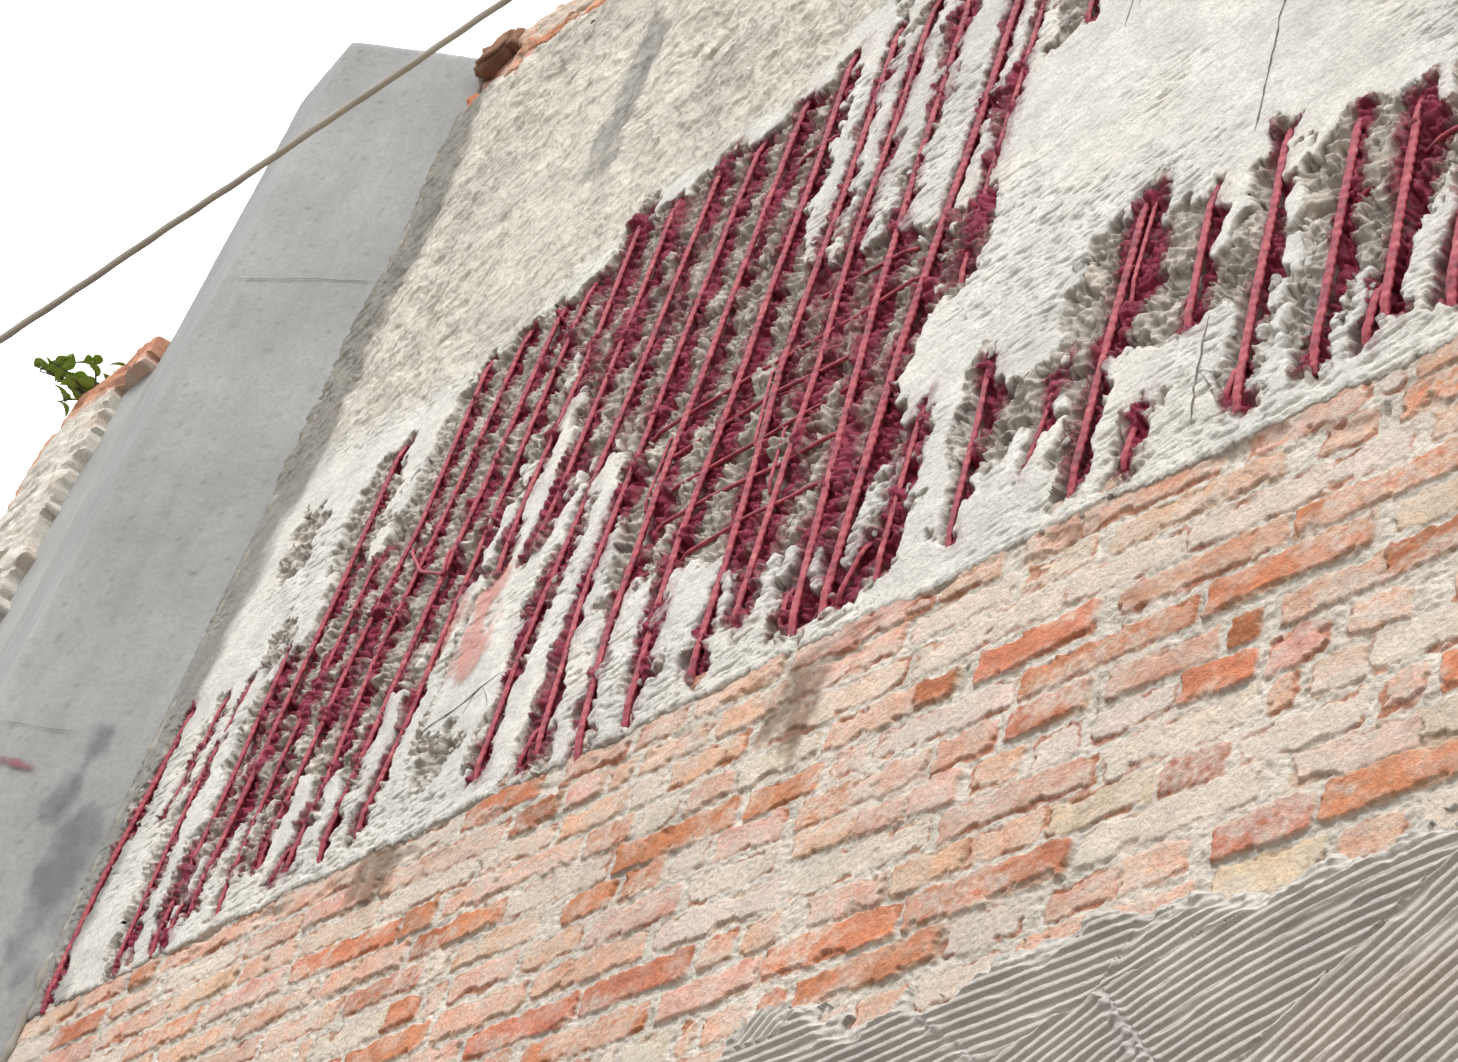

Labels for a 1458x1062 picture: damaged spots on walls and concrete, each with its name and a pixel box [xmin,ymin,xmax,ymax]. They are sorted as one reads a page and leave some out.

crack [1254,0,1286,131]
spalling [39,0,1100,1015]
rust [110,0,1048,977]
rust [1041,175,1172,493]
spalling [926,59,1458,548]
rust [1175,179,1230,335]
rust [1218,113,1302,414]
rust [1291,66,1454,378]
rust [1434,210,1458,304]
rust [47,939,74,1004]